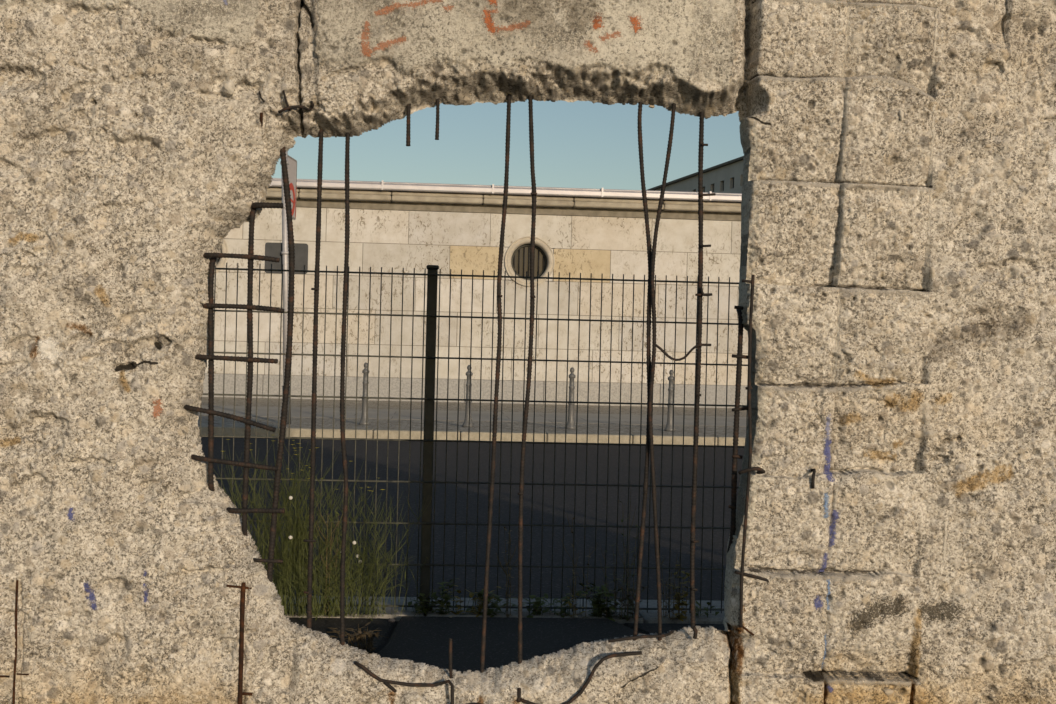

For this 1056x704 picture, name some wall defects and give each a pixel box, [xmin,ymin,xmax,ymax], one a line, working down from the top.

crack [300,0,314,28]
spalling [0,0,828,704]